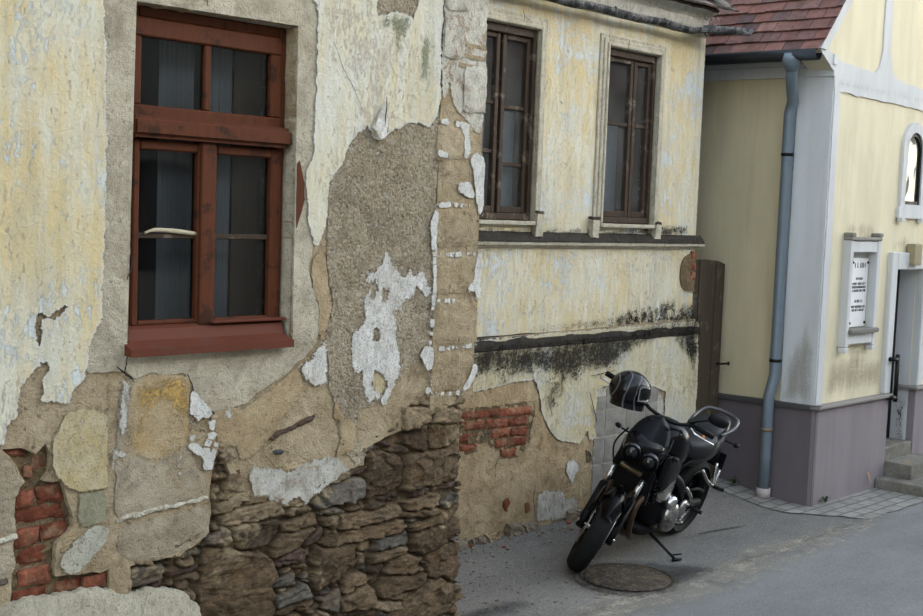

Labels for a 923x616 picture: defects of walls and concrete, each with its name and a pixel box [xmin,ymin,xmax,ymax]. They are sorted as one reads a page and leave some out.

flaking render [376,0,419,19]
flaking render [247,104,591,540]
water stain [474,300,701,407]
spalling [679,251,697,292]
flaking render [1,408,155,601]